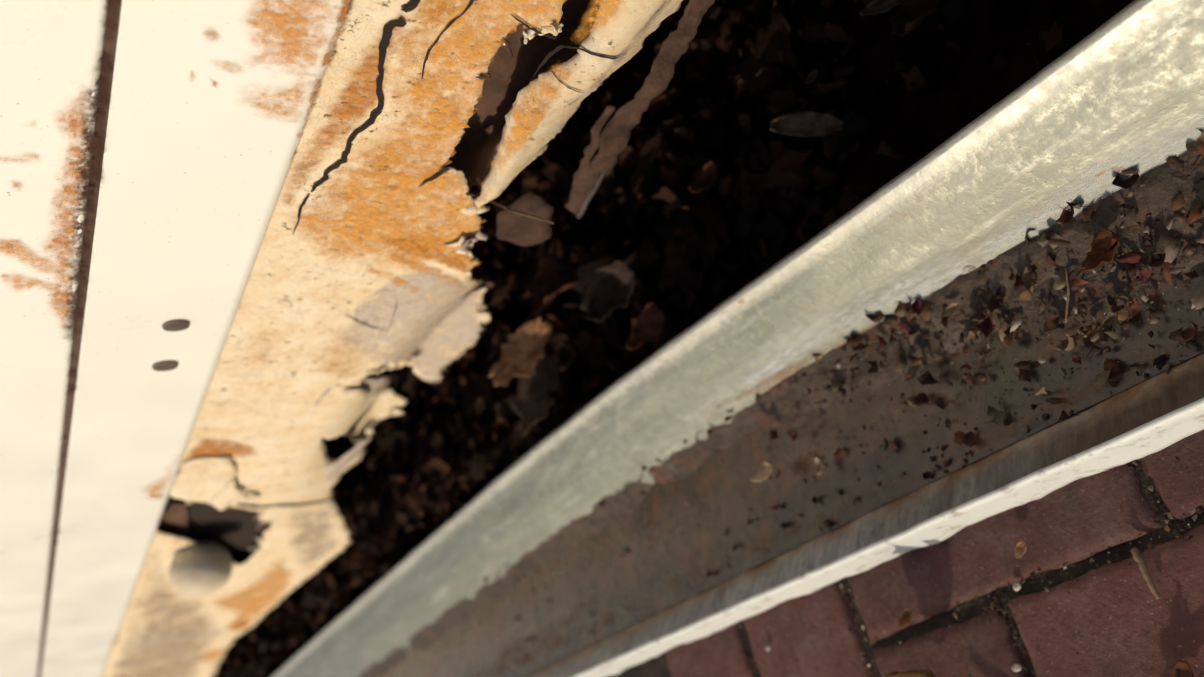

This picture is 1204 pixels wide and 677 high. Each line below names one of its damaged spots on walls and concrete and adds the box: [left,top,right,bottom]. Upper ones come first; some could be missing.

corrosion [248,0,353,116]
crack [422,0,477,79]
crack [510,14,625,92]
corrosion [0,55,112,339]
crack [293,0,420,233]
crack [418,167,451,187]
corrosion [287,0,715,293]
peeling [456,0,683,216]
peeling [488,316,552,386]
peeling [175,456,247,511]
corrosion [190,439,252,458]
peeling [326,409,405,482]